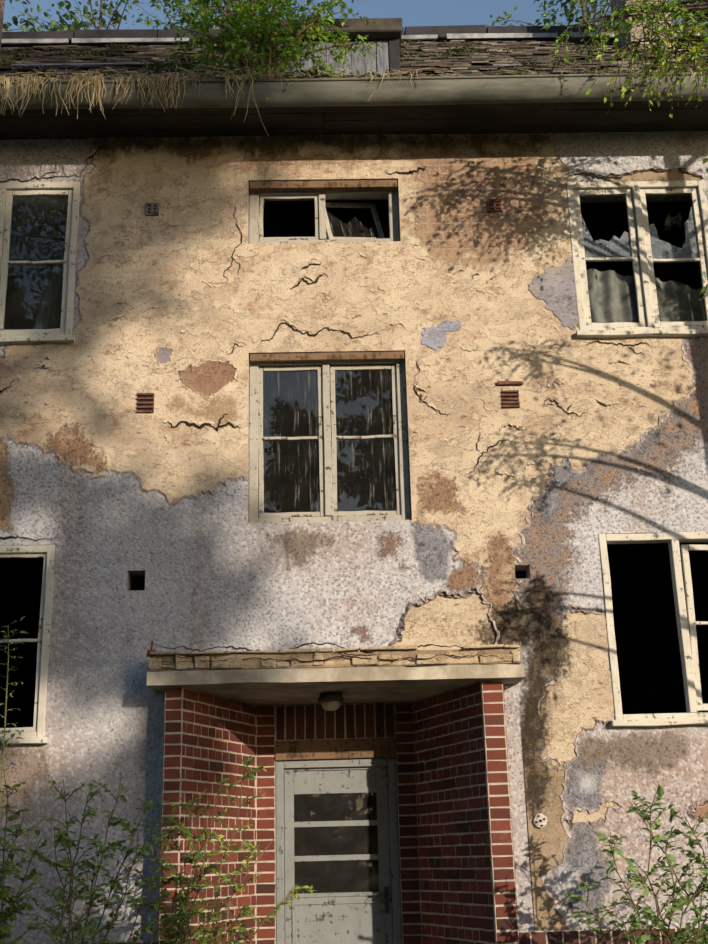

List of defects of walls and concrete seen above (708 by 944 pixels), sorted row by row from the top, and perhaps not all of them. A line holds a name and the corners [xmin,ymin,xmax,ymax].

crack [0,150,99,183]
crack [224,205,242,283]
crack [290,263,328,289]
crack [228,322,387,355]
flaking render [0,129,704,651]
crack [414,360,448,416]
crack [544,398,588,416]
crack [468,433,516,474]
water stain [376,337,708,816]
crack [149,642,514,663]
flaking render [523,602,625,931]
flaking render [686,794,708,823]